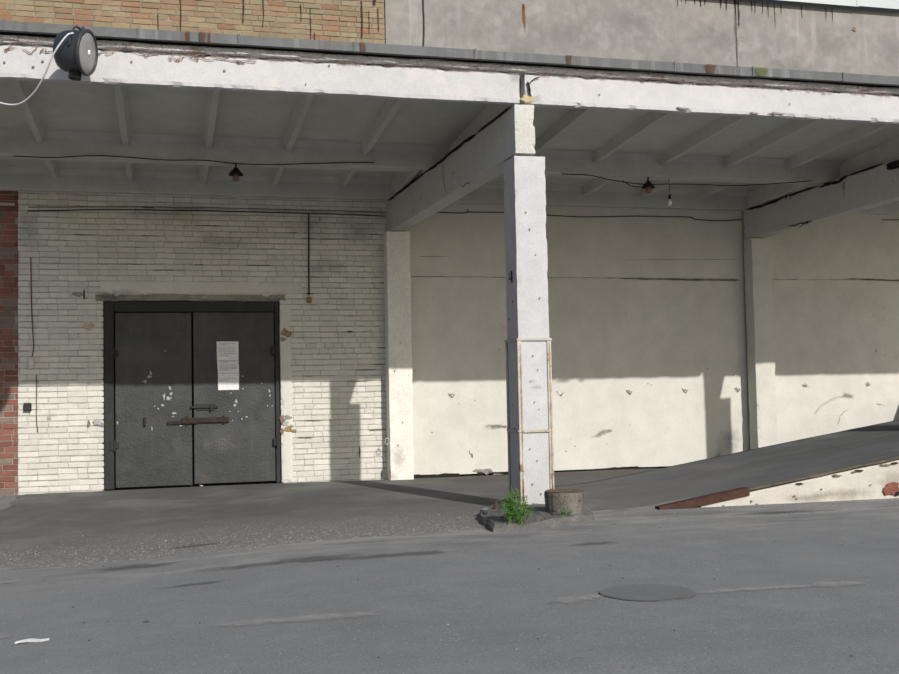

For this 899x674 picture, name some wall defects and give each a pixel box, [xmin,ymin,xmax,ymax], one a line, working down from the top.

crack [388,77,540,201]
crack [747,163,884,210]
spalling [883,482,899,496]